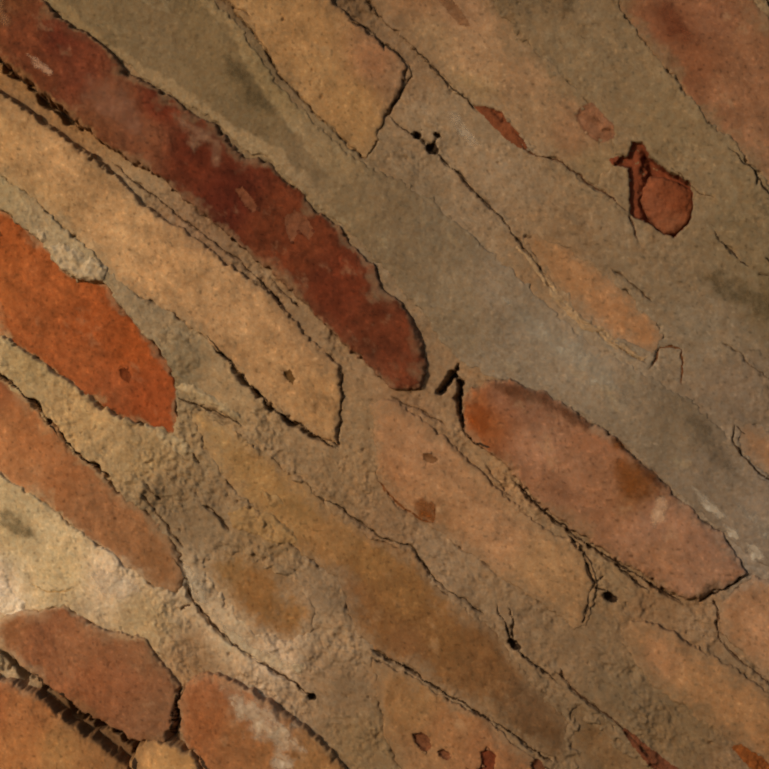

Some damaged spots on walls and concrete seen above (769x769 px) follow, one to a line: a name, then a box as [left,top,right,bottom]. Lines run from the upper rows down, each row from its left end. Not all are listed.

spalling [474,105,531,152]
spalling [480,747,496,769]
spalling [529,759,545,769]